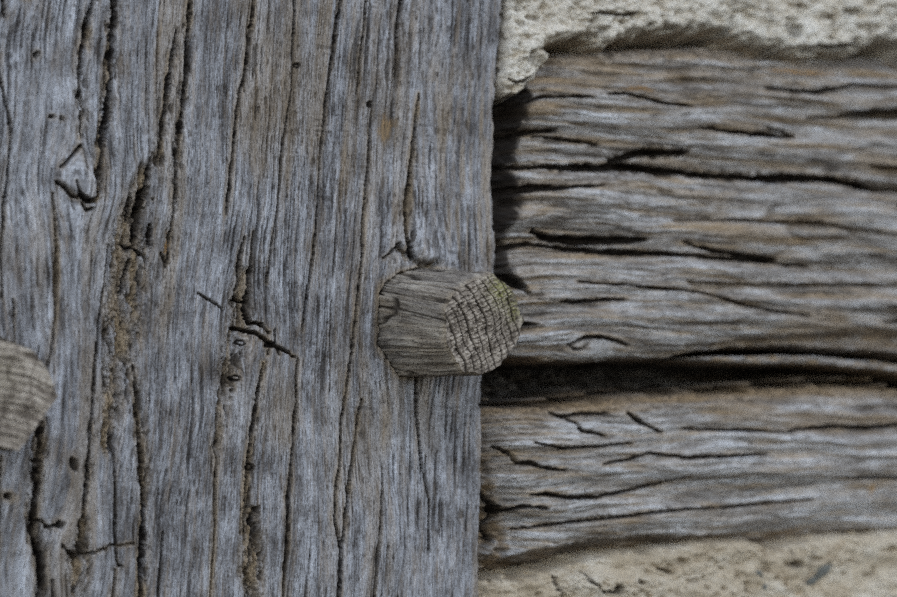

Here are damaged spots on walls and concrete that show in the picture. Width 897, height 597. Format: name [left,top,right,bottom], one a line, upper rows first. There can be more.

crack [393,0,405,80]
crack [402,92,421,249]
crack [490,75,897,209]
crack [197,0,372,597]
crack [478,217,897,542]
crack [372,473,399,597]
crack [551,570,625,597]